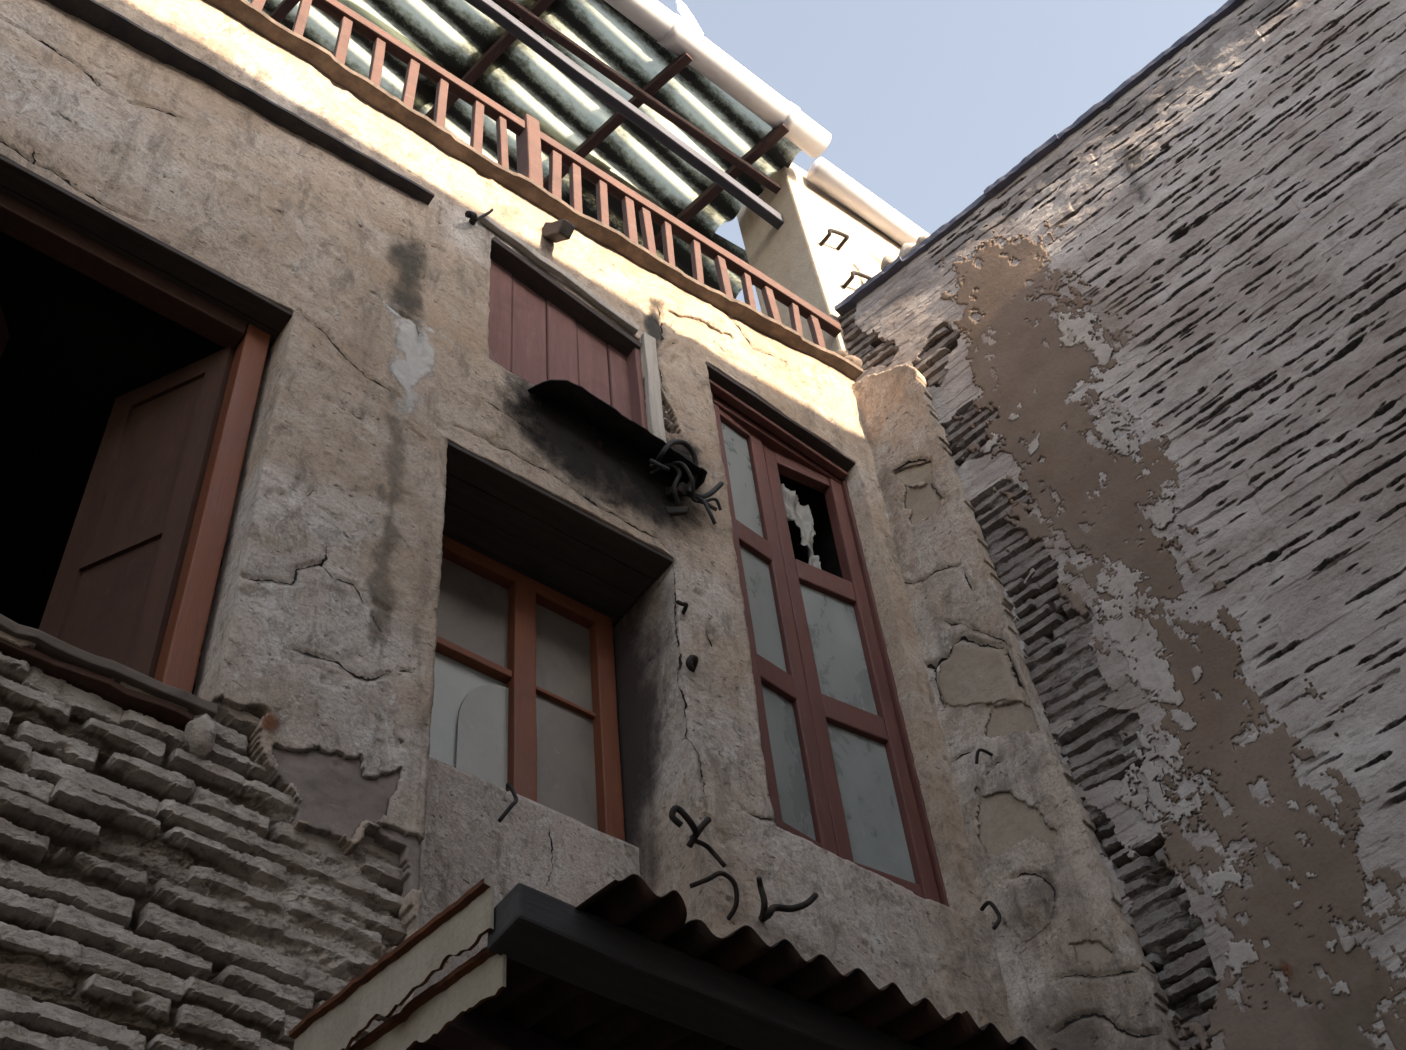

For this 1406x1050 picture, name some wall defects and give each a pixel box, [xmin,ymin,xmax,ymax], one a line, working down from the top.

crack [0,141,132,219]
spalling [837,306,899,371]
damp [368,242,434,641]
peeling [895,463,934,486]
crack [248,490,391,632]
crack [294,649,412,681]
peeling [912,220,1406,1050]
spalling [0,652,422,1050]